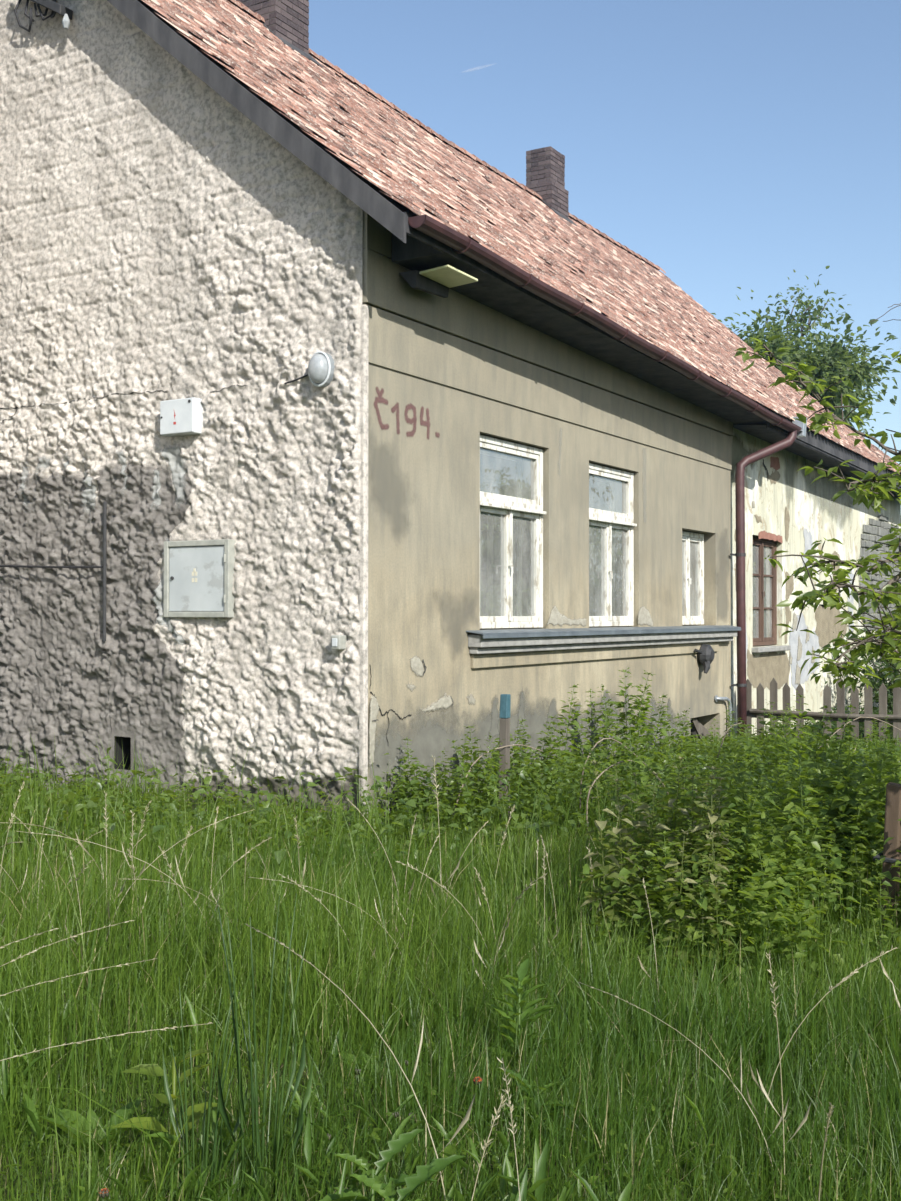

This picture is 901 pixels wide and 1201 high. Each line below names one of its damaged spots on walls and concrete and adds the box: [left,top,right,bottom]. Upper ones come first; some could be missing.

crack [0,390,166,423]
flaking render [422,693,475,712]